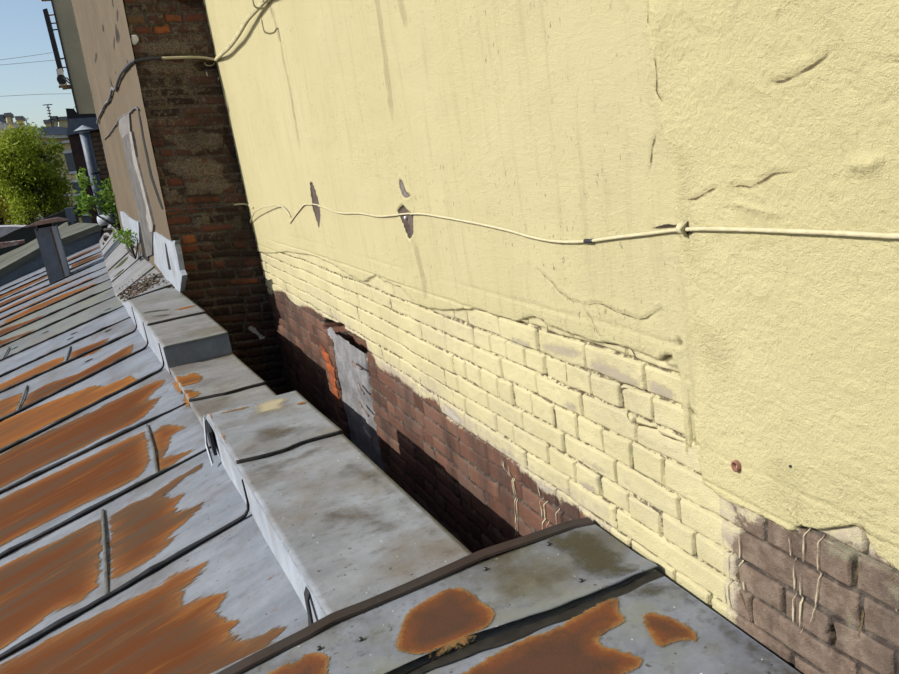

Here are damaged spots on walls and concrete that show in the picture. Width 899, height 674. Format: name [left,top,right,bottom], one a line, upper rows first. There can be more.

crack [774,53,827,83]
crack [736,172,787,188]
corrosion [0,246,101,345]
spalling [317,343,340,400]
corrosion [0,337,203,546]
corrosion [0,463,203,649]
corrosion [0,561,286,674]
corrosion [395,587,495,657]
corrosion [462,598,642,674]
corrosion [642,612,698,647]